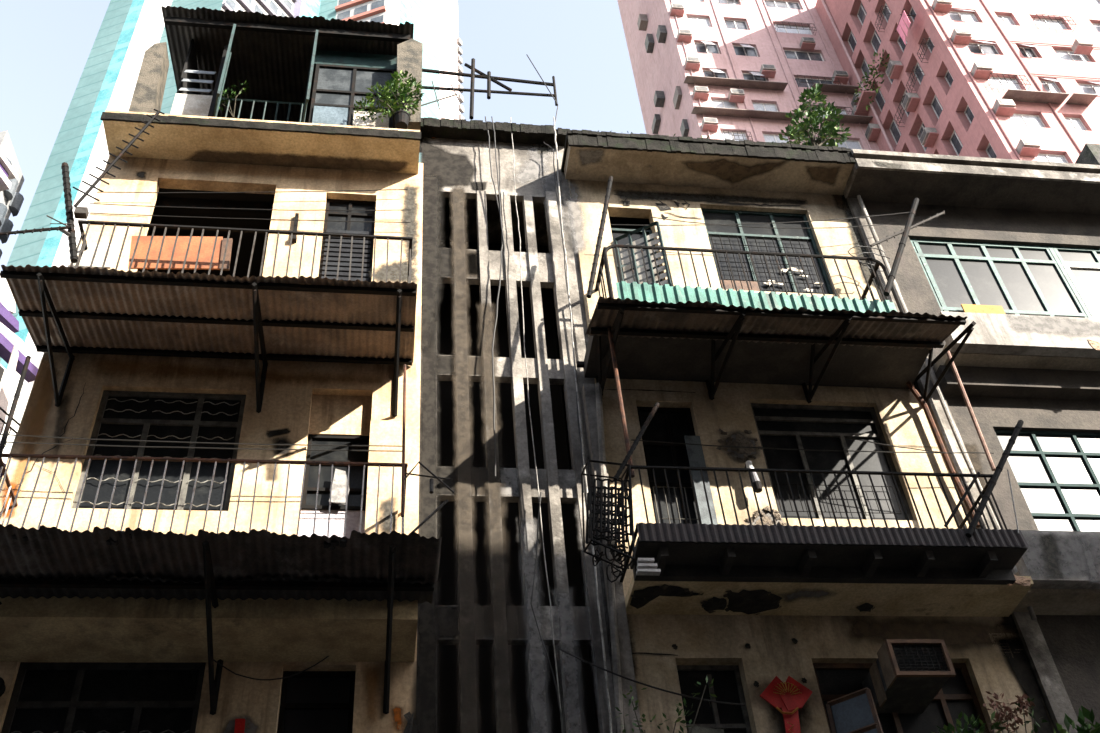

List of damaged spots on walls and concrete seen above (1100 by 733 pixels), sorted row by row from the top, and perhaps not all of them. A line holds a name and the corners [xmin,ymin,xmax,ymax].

leakage [517,144,585,251]
leakage [614,158,807,205]
leakage [806,166,840,185]
leakage [185,137,548,733]
spalling [630,584,831,615]
leakage [556,590,584,733]